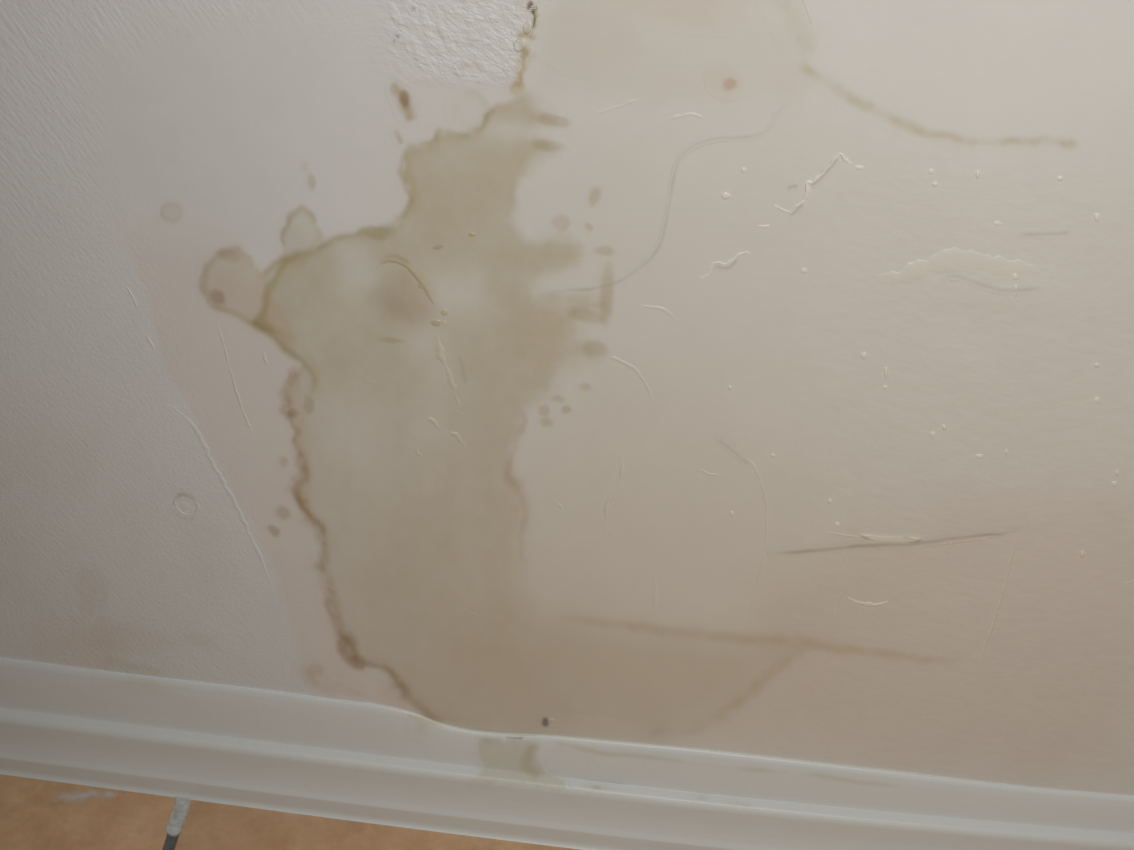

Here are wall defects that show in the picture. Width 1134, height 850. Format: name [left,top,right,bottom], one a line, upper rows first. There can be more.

damp [538,0,1086,156]
crack [700,153,852,279]
damp [194,54,976,796]